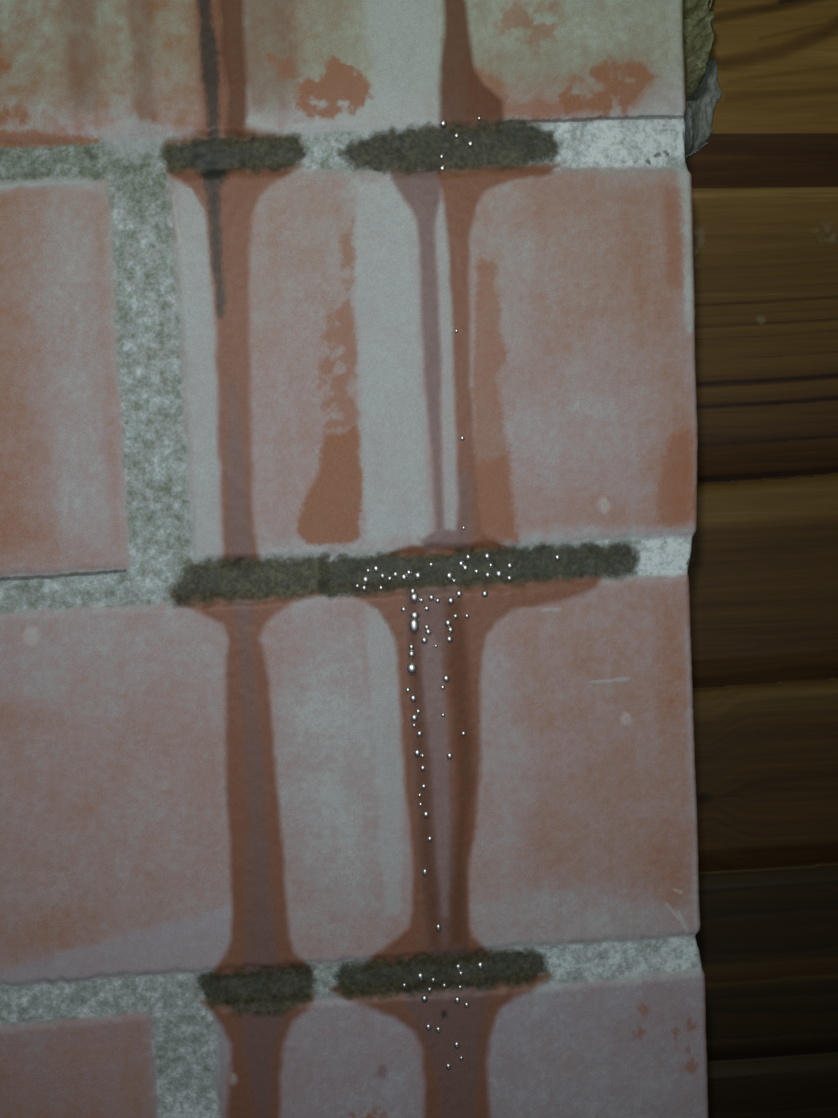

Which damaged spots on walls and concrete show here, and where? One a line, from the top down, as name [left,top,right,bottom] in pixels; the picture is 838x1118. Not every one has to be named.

water stain [0,0,640,1118]